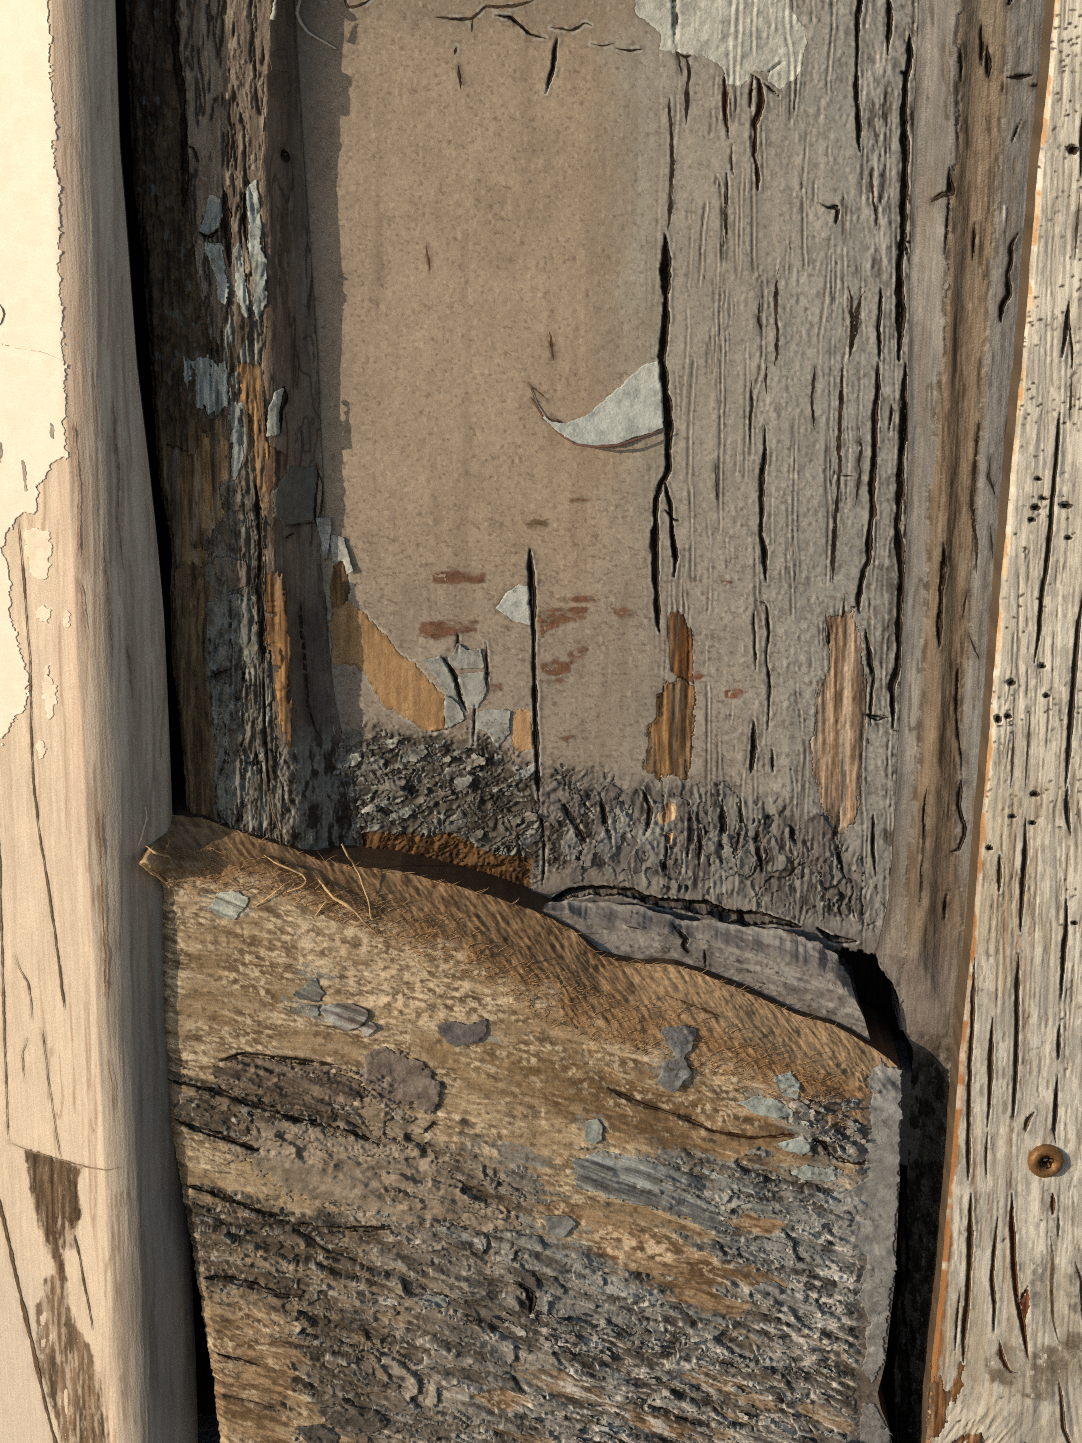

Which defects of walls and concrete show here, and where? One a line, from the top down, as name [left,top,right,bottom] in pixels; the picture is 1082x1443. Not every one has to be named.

peeling [635,0,807,90]
peeling [0,0,69,746]
peeling [316,517,771,884]
peeling [530,361,664,448]
crack [527,268,886,967]
crack [651,0,779,632]
crack [810,0,976,732]
crack [1034,304,1074,663]
crack [1065,601,1082,833]
peeling [210,978,576,1250]
peeling [738,1057,903,1382]
crack [955,821,1082,1373]